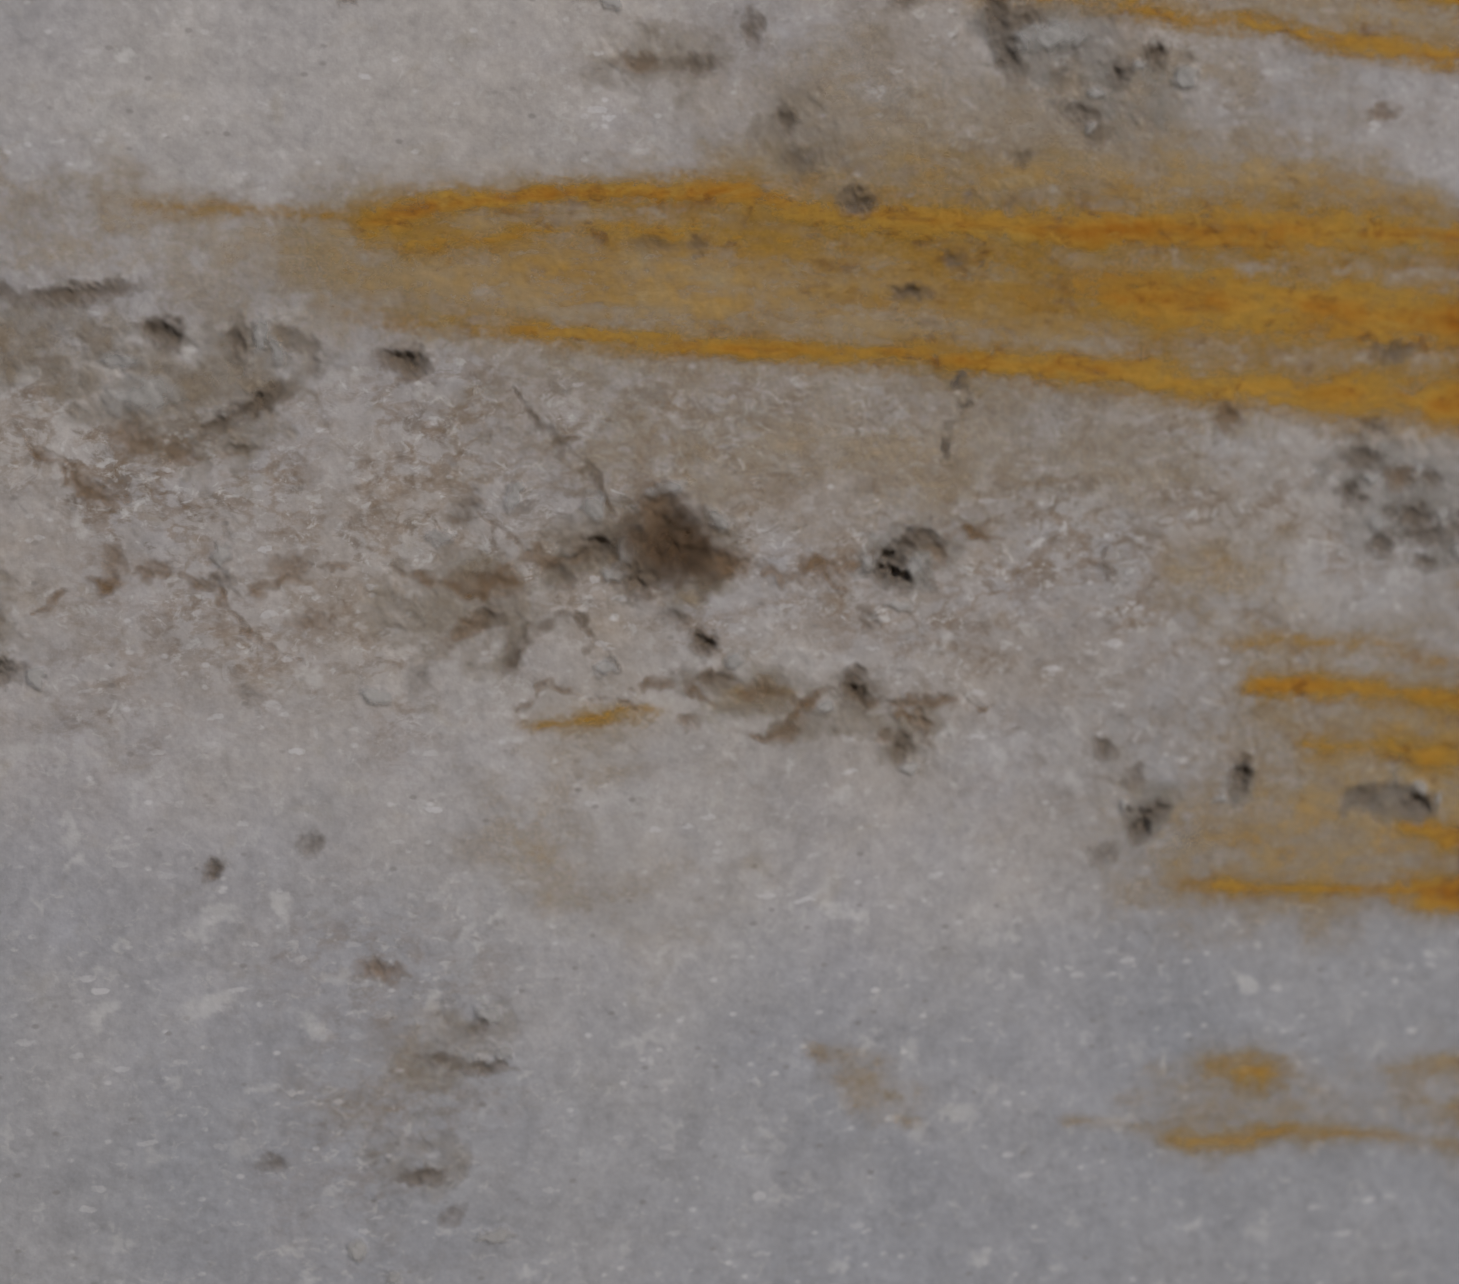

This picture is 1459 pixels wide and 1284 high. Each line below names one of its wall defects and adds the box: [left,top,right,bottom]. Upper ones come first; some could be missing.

spalling [985,0,1086,68]
rust [1039,0,1459,72]
spalling [1073,46,1164,133]
rust [313,145,1459,429]
spalling [0,284,118,384]
spalling [82,321,283,447]
spalling [560,482,728,605]
spalling [860,530,937,610]
spalling [694,634,714,653]
spalling [844,666,867,721]
rust [1169,659,1459,914]
rust [1167,1124,1376,1150]